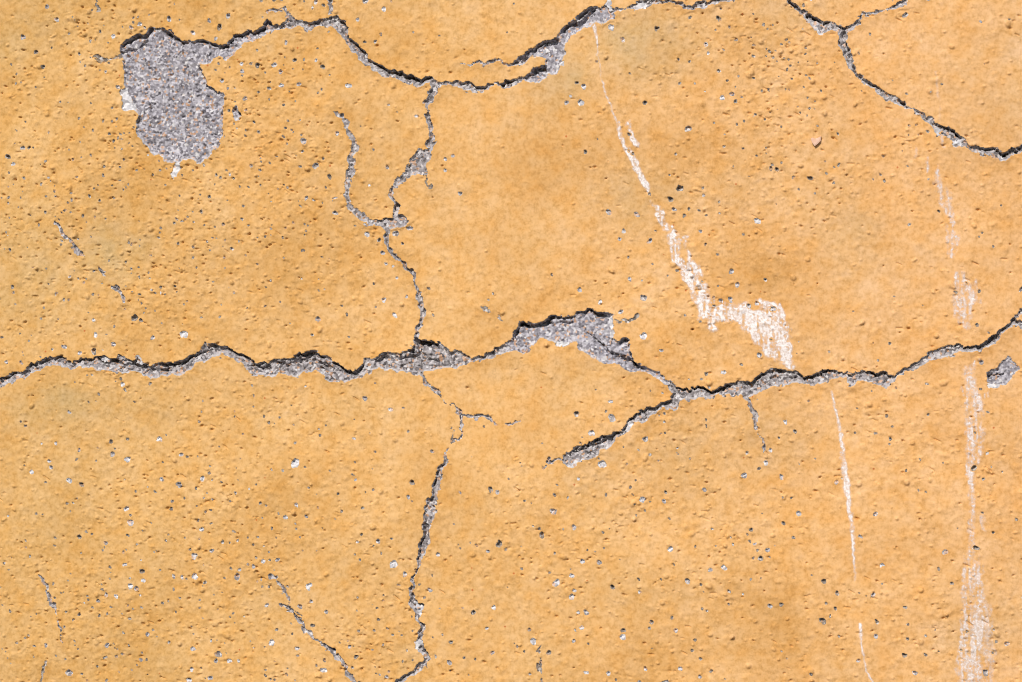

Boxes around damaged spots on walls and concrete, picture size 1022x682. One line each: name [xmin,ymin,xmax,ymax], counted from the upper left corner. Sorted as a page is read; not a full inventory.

flaking render [1,0,338,340]
leakage [603,82,649,193]
crack [613,0,735,12]
crack [787,0,1022,161]
crack [0,0,526,682]
flaking render [504,300,670,394]
leakage [655,205,795,369]
crack [542,287,1022,470]
leakage [954,273,976,328]
flaking render [979,356,1020,390]
crack [535,645,543,682]
leakage [958,488,994,682]